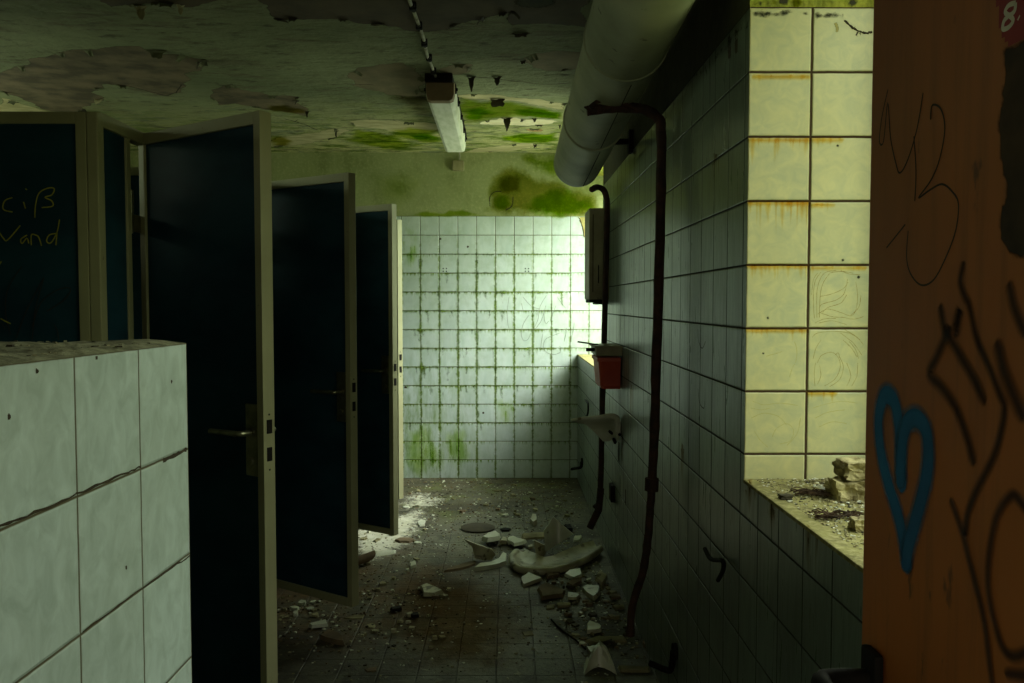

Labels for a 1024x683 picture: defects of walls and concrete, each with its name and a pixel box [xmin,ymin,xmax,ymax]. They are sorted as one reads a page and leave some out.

peeling [0,46,209,112]
peeling [210,84,309,117]
peeling [271,120,438,148]
peeling [458,76,567,153]